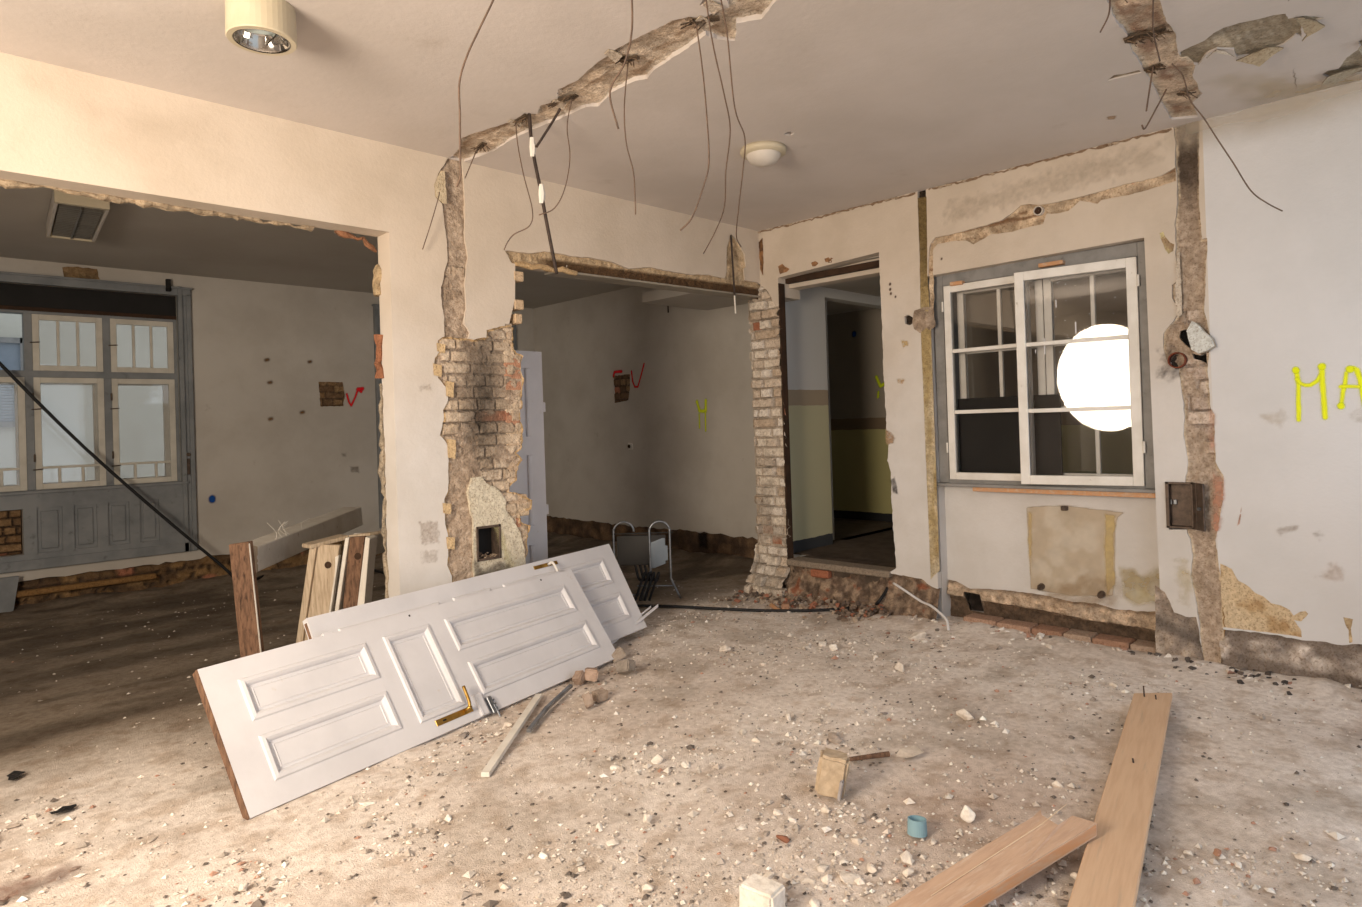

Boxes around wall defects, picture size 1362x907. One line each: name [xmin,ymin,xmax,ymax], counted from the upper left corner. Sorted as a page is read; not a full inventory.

peeling [1180,14,1325,67]
peeling [1322,40,1362,85]
peeling [434,171,447,204]
spalling [1160,232,1174,254]
spalling [1181,330,1207,363]
flaking render [433,237,789,582]
flaking render [781,505,1204,660]
flaking render [1219,564,1362,689]